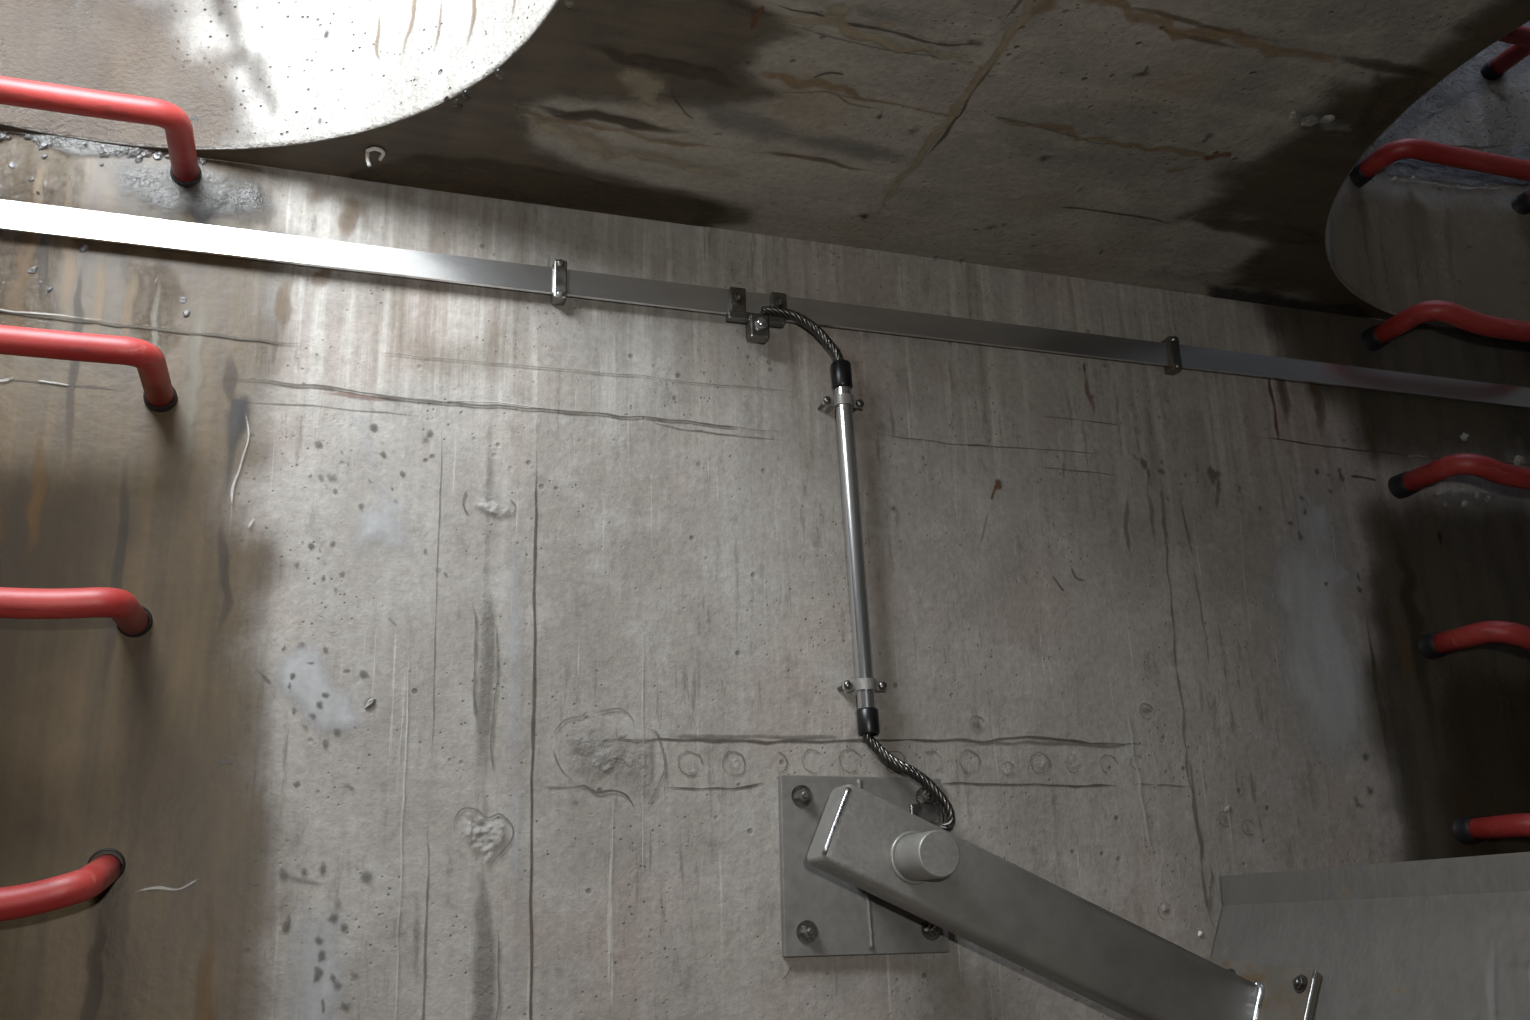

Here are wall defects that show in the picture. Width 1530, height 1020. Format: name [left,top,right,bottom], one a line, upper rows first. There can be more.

leakage [0,0,855,233]
crack [781,6,994,152]
leakage [1188,0,1530,388]
crack [0,309,291,344]
crack [0,378,109,389]
crack [242,379,766,439]
crack [398,354,767,389]
leakage [1268,378,1288,437]
leakage [1311,383,1530,462]
leakage [0,230,287,1020]
leakage [1272,469,1530,861]